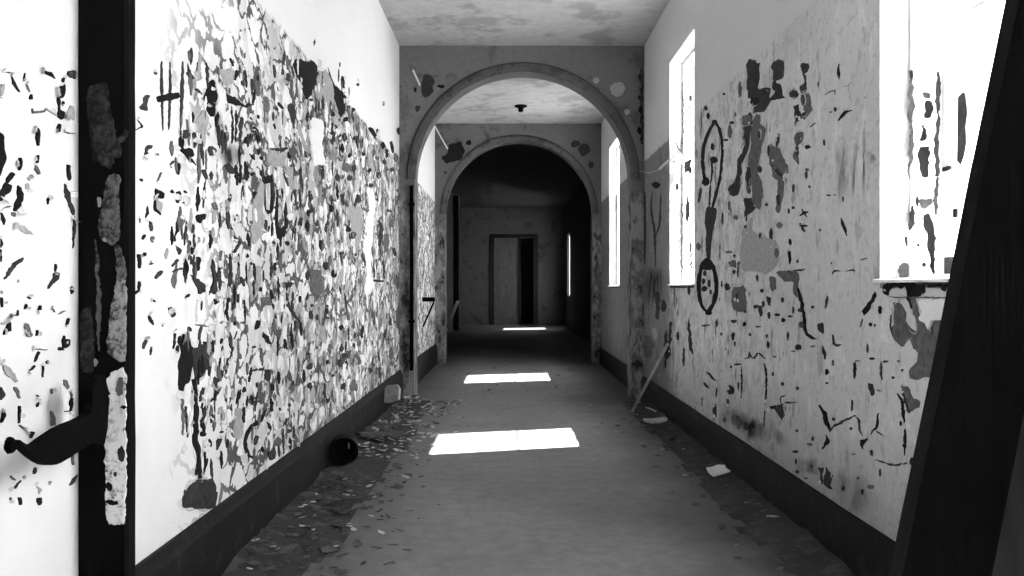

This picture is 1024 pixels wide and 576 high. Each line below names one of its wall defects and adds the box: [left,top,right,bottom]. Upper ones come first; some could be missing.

peeling [0,359,35,438]
peeling [9,467,52,505]
peeling [0,67,79,378]
peeling [36,380,75,426]
flaking render [135,48,400,512]
flaking render [404,73,458,115]
flaking render [442,140,471,174]
flaking render [715,59,834,384]
crack [776,258,913,466]
flaking render [866,70,953,416]